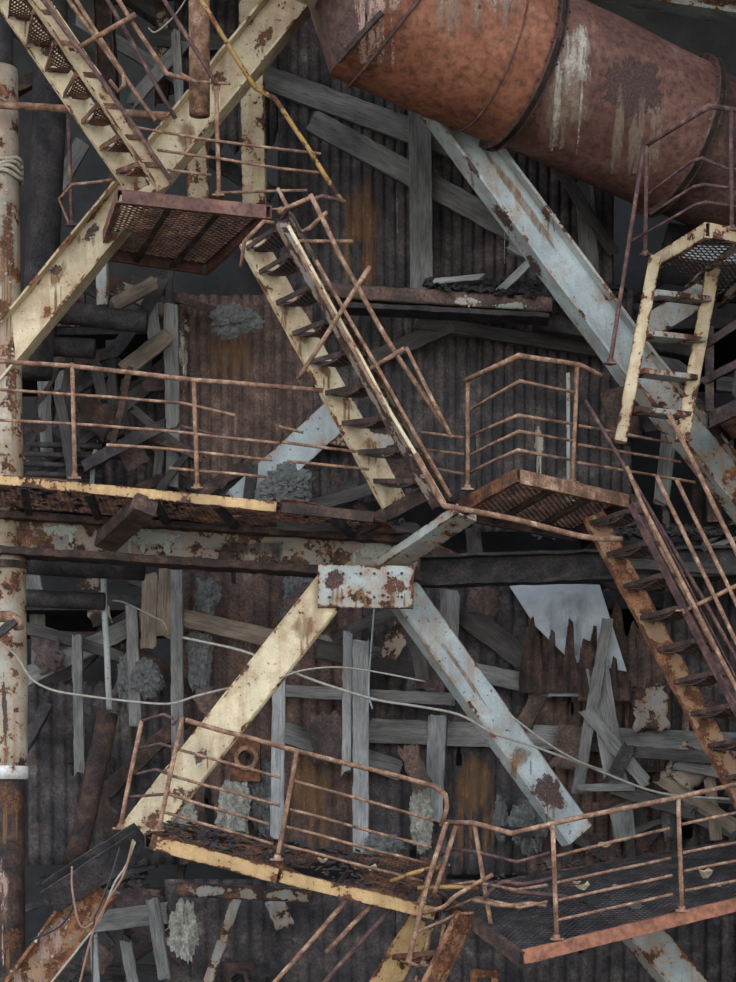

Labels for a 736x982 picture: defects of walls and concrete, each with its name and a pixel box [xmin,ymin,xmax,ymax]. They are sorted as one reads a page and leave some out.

corrosion [597,54,667,174]
corrosion [482,149,521,201]
corrosion [529,205,556,246]
corrosion [381,572,408,607]